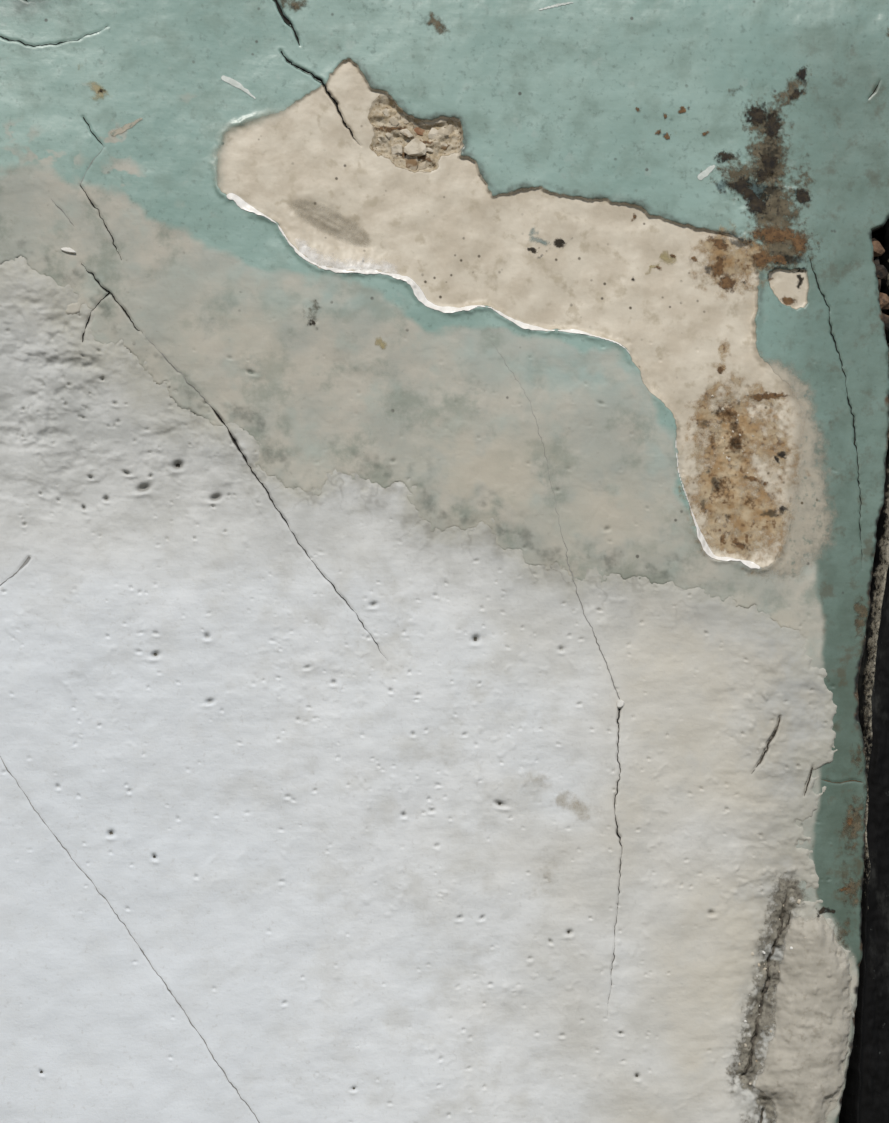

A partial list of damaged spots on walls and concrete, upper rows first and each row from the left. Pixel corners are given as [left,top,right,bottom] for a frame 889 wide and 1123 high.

crack [0,26,107,47]
crack [51,117,122,260]
crack [274,0,357,142]
rust [691,68,819,309]
crack [82,264,388,661]
peeling [218,58,832,575]
rust [686,344,798,556]
crack [810,260,862,553]
crack [496,348,625,1014]
crack [752,716,780,773]
crack [0,756,260,1123]